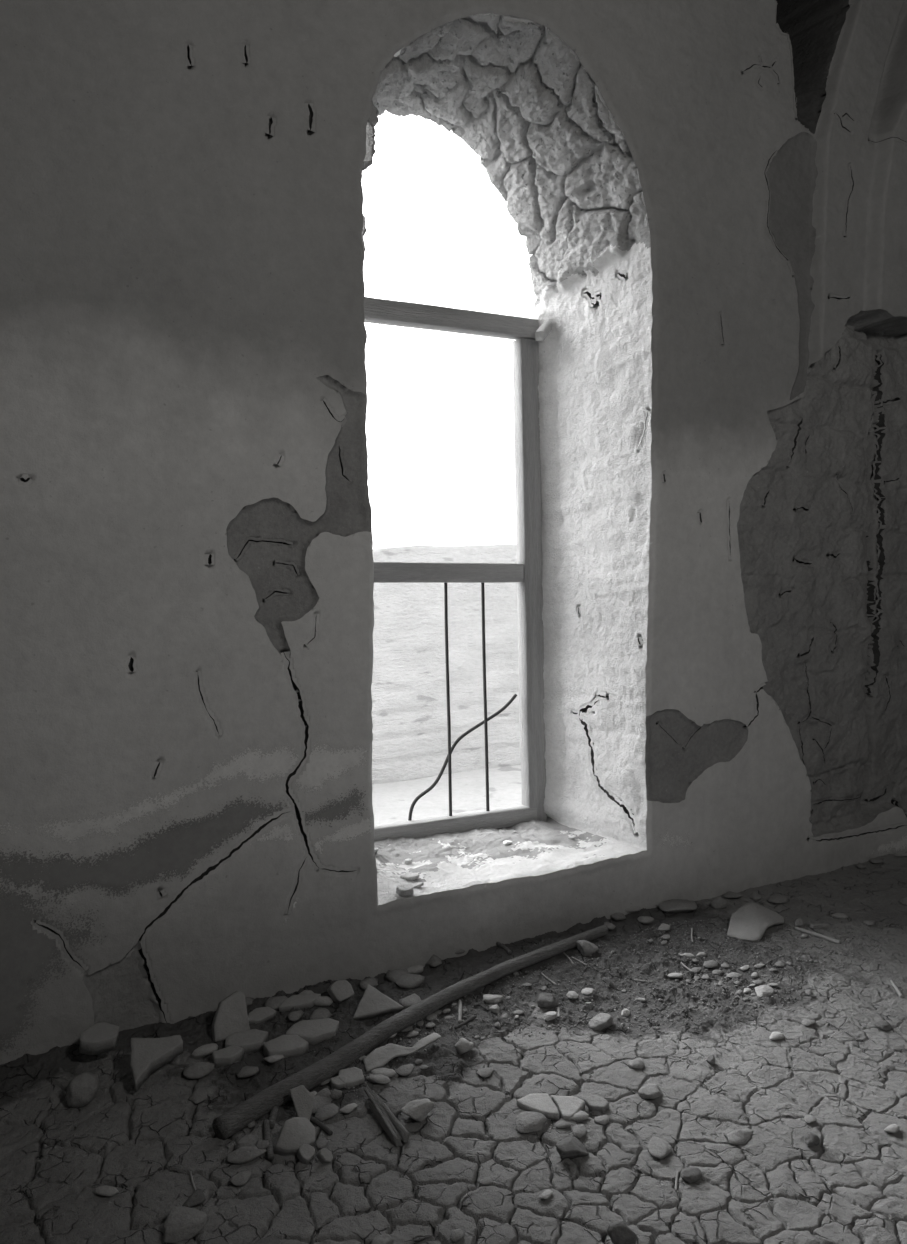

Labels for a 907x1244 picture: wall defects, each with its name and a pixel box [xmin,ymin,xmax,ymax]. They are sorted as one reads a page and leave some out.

flaking render [204,375,372,657]
flaking render [737,0,907,837]
crack [124,613,358,1024]
crack [572,691,638,834]
flaking render [645,709,748,803]